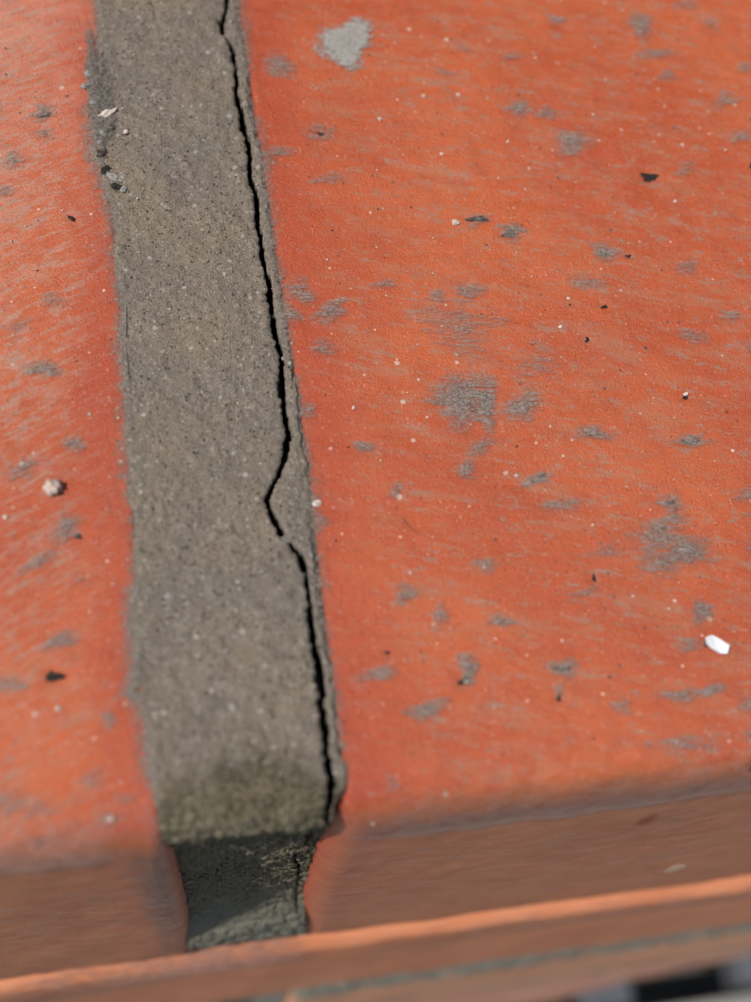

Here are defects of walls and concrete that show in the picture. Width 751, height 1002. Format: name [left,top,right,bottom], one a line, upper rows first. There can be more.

crack [209,0,337,816]